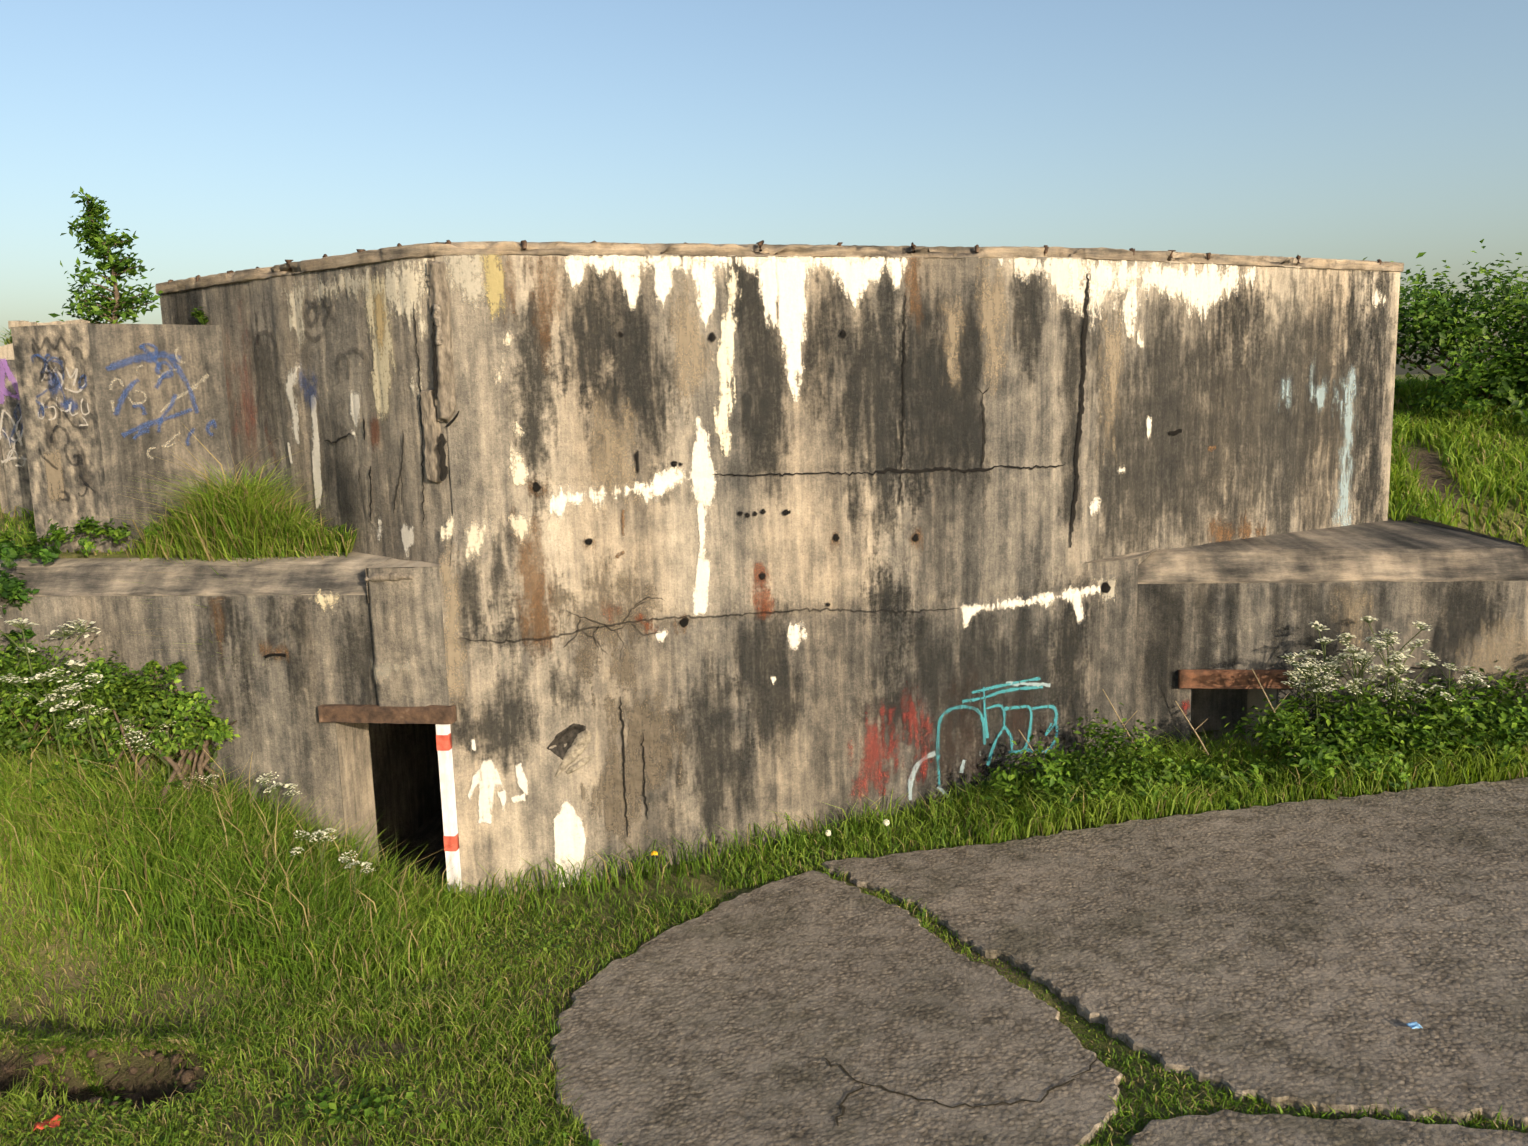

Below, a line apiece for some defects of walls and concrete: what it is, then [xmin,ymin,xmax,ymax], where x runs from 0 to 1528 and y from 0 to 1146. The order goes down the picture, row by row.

crack [325,304,459,527]
leakage [284,254,505,436]
leakage [401,524,414,557]
leakage [451,668,535,774]
leakage [551,673,579,706]
spalling [547,557,685,845]
leakage [441,255,991,650]
leakage [669,600,807,834]
leakage [861,572,1101,804]
leakage [1146,584,1239,695]
leakage [998,257,1394,560]
crack [825,1055,1097,1126]